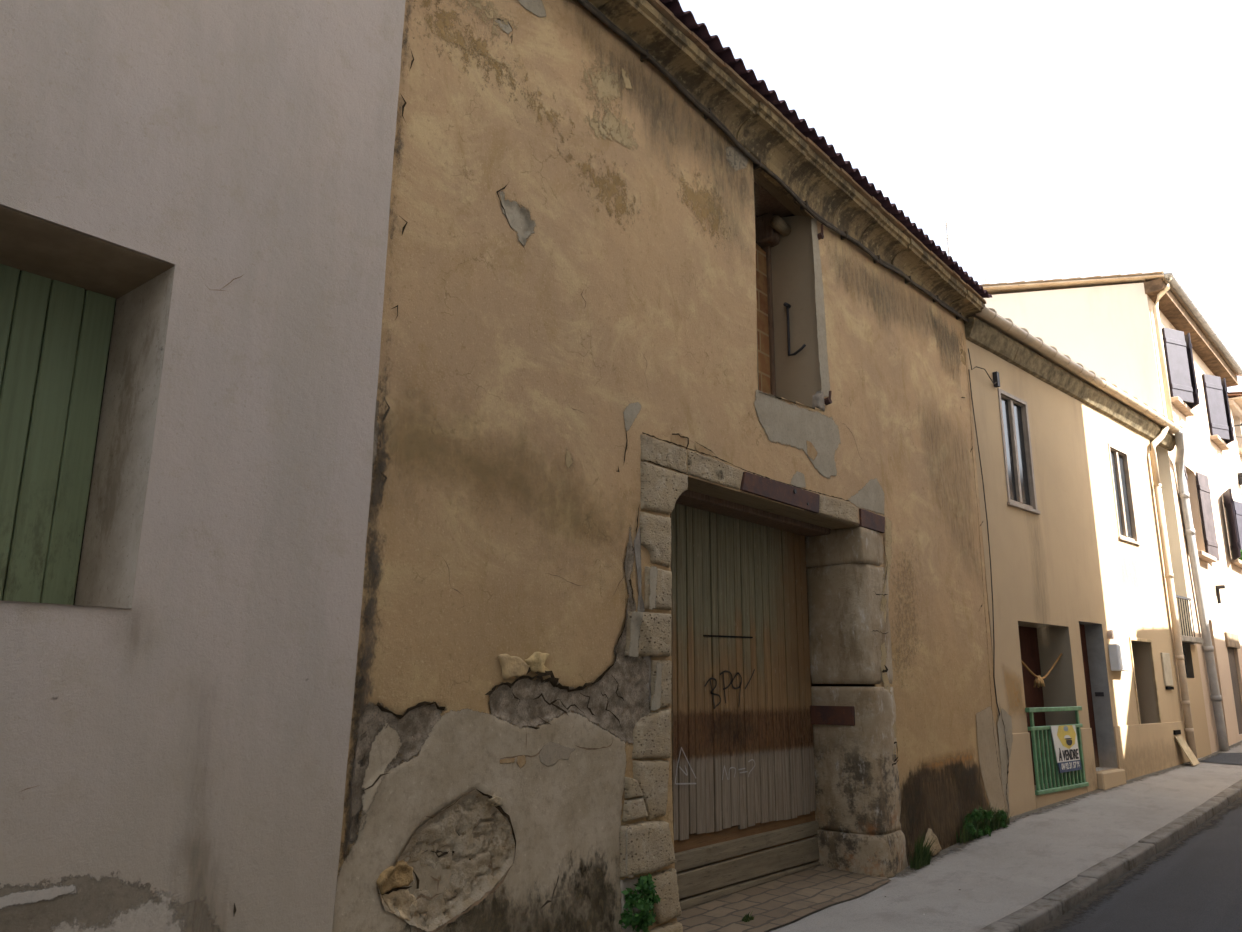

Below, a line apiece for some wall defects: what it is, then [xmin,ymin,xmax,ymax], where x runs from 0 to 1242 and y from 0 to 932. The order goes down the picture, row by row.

peeling [411,0,641,230]
spalling [496,182,536,253]
peeling [672,169,732,247]
peeling [488,525,651,744]
peeling [0,870,220,932]
peeling [346,701,446,845]
spalling [376,788,516,932]
leakage [445,853,615,932]
leakage [899,753,991,866]